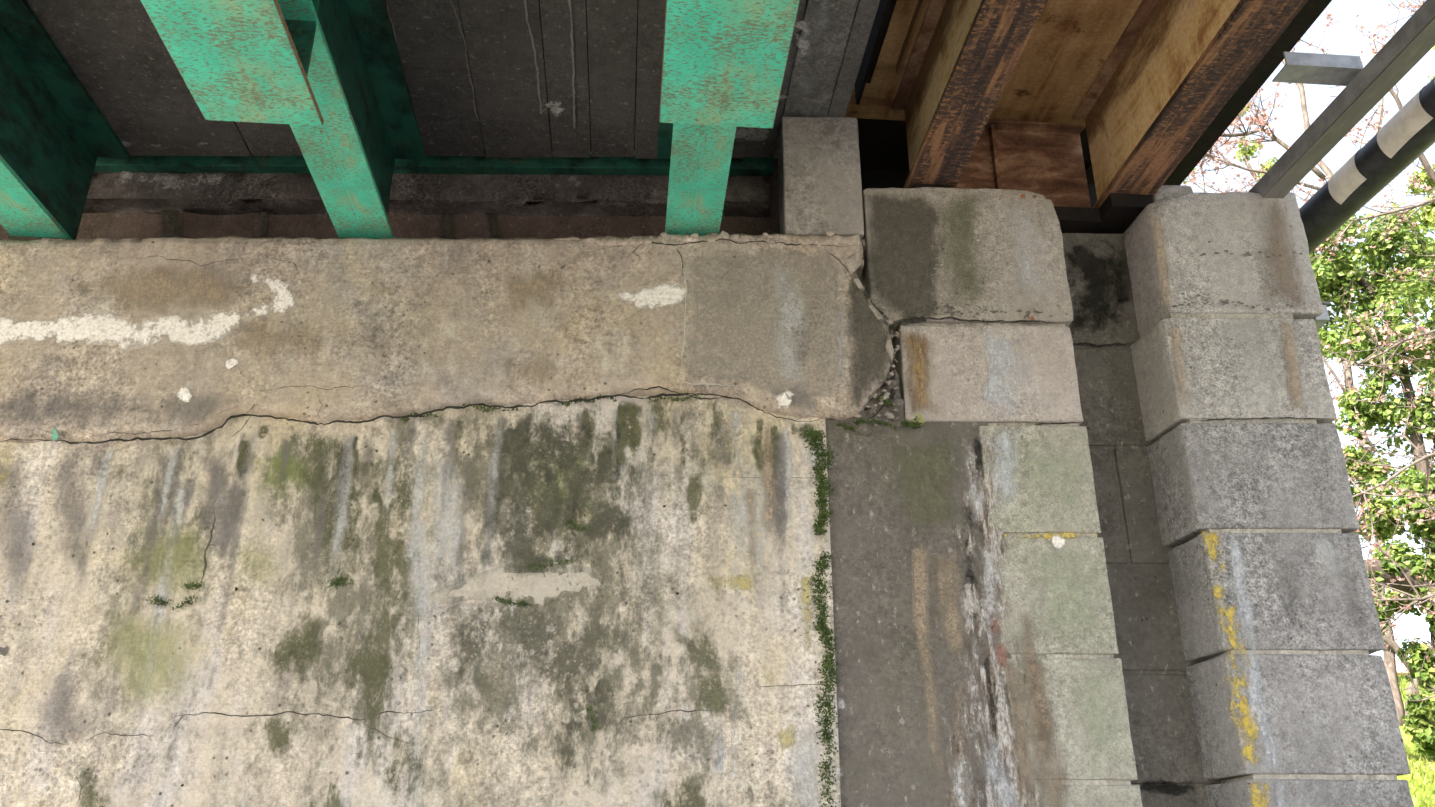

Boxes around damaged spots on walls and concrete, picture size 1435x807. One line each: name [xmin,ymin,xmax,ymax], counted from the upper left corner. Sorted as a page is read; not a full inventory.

water stain [735,127,770,141]
water stain [618,284,686,309]
water stain [1066,240,1129,331]
water stain [173,387,214,416]
crack [1,238,1055,520]
water stain [741,420,819,563]
water stain [133,426,268,676]
water stain [273,435,429,795]
water stain [441,402,738,807]
water stain [265,719,289,752]
water stain [80,772,105,807]
water stain [310,786,343,807]